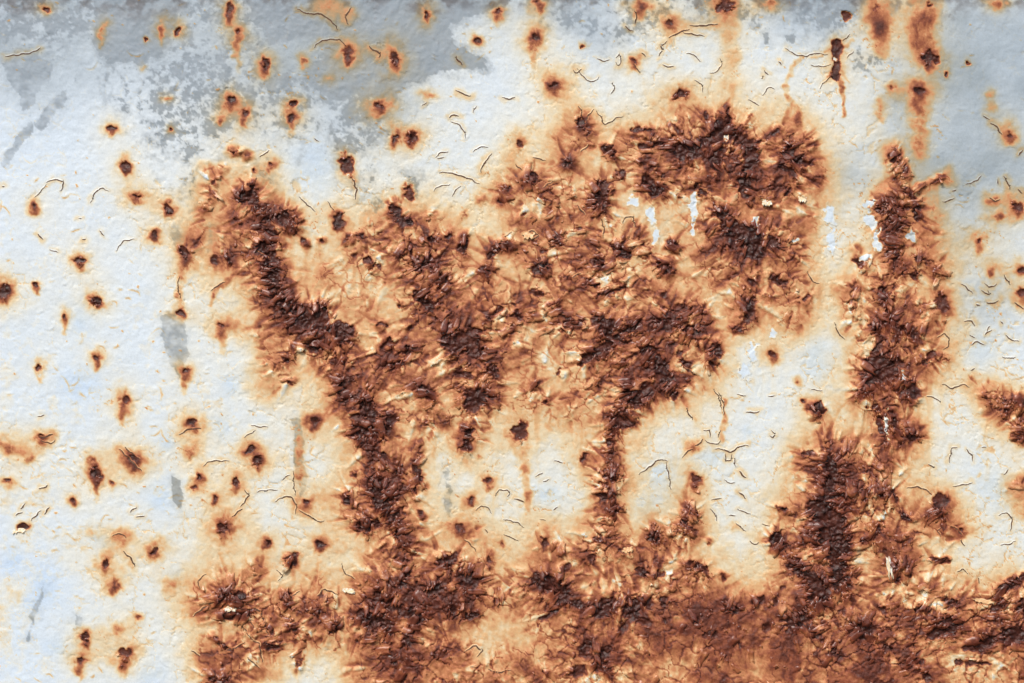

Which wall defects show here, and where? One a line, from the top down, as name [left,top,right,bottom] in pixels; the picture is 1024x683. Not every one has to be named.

corrosion [215,0,250,70]
peeling [545,0,660,64]
corrosion [210,86,265,133]
peeling [0,0,531,206]
corrosion [259,0,410,144]
corrosion [356,87,433,157]
corrosion [24,179,63,244]
corrosion [0,258,53,314]
corrosion [56,216,140,315]
corrosion [32,333,154,433]
corrosion [159,360,209,401]
corrosion [0,418,166,546]